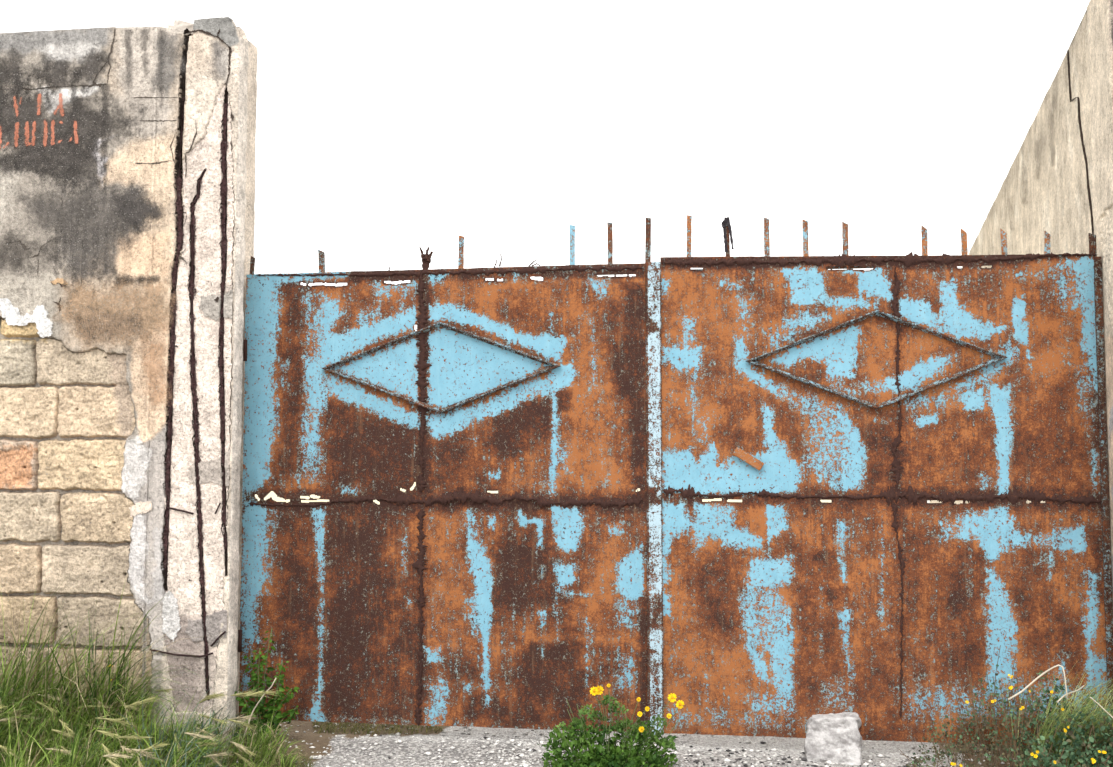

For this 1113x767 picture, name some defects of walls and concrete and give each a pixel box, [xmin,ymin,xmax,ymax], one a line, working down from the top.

damp [0,50,160,285]
flaking render [0,85,234,729]
crack [132,28,232,698]
crack [1067,50,1094,234]